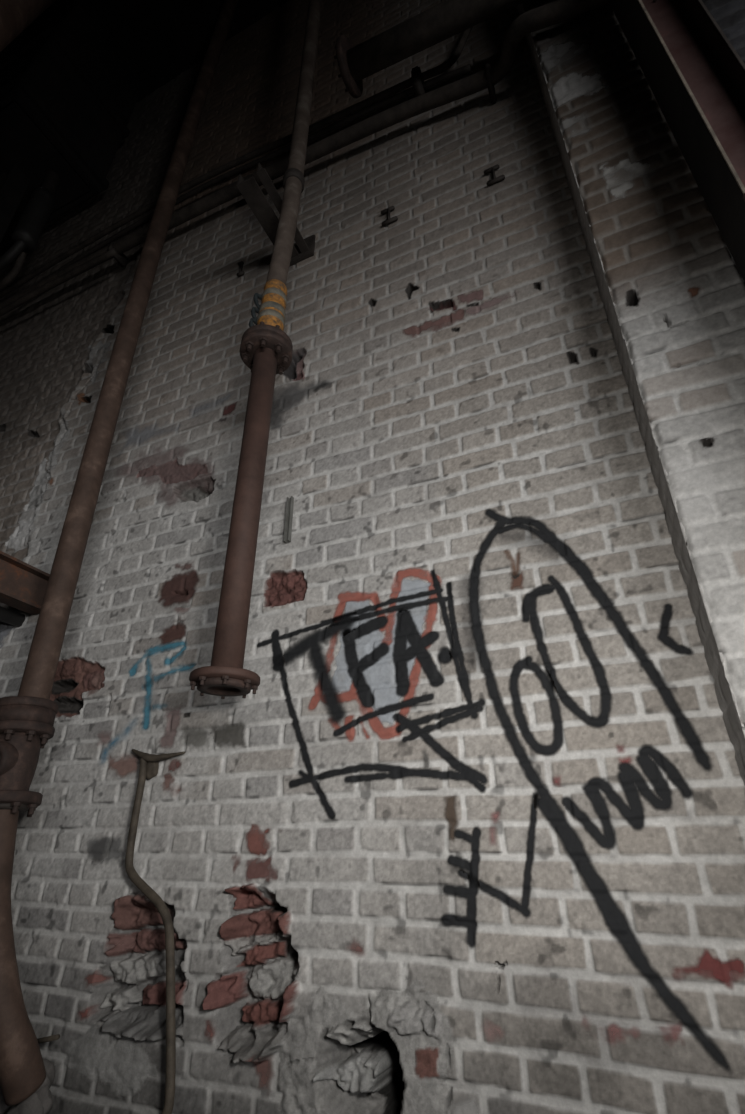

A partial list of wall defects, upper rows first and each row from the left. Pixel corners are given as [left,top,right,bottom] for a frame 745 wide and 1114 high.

peeling [403,290,508,336]
spalling [135,457,215,503]
spalling [262,569,308,609]
spalling [49,655,105,719]
spalling [79,892,189,1049]
spalling [203,825,454,1114]